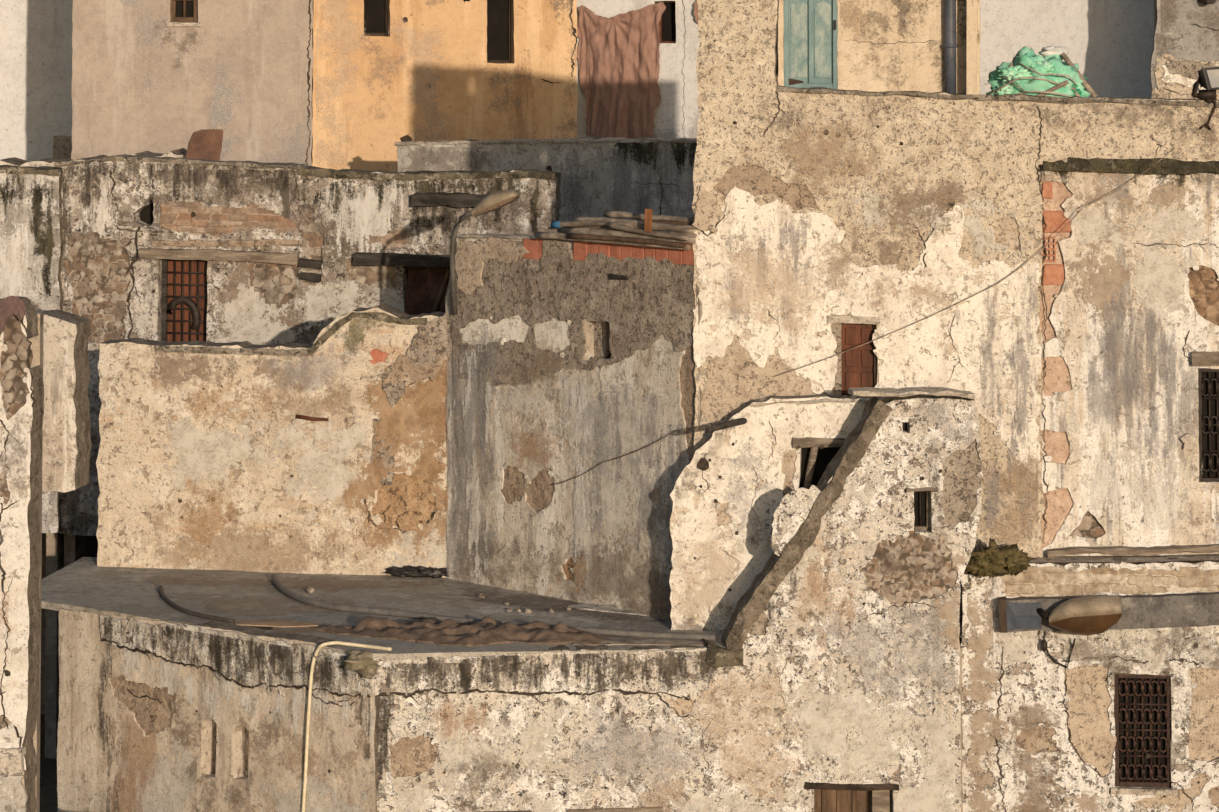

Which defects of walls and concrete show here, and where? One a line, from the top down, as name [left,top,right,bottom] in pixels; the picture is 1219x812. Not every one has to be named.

water stain [30,189,55,296]
spalling [61,232,132,344]
crack [107,165,155,339]
peeling [670,161,1219,476]
crack [364,498,438,534]
spalling [501,466,555,514]
crack [0,419,25,748]
water stain [106,618,414,790]
crack [101,638,712,768]
water stain [461,655,540,694]
water stain [663,655,683,689]
spalling [862,439,1219,812]